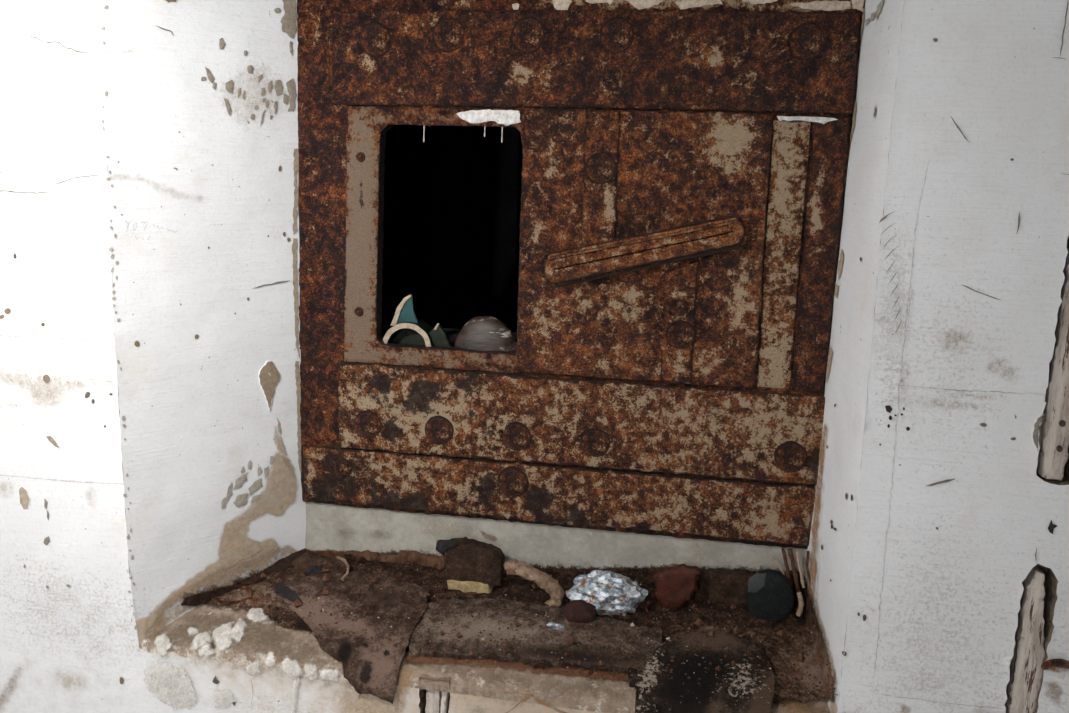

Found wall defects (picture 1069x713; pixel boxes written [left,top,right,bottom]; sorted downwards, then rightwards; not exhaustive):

peeling [274,0,297,56]
peeling [201,50,297,126]
leakage [146,435,297,653]
crack [505,692,567,713]